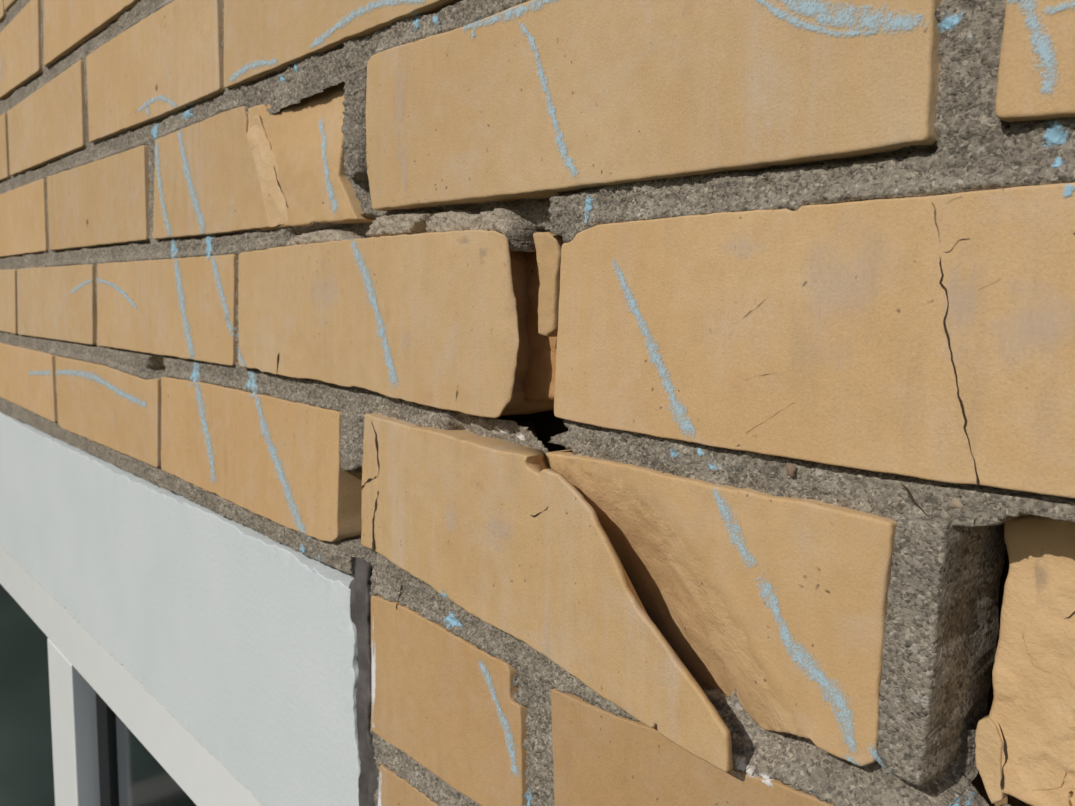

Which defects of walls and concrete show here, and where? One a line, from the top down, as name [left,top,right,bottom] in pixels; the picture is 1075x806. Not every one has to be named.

spalling [247,82,375,231]
crack [934,211,980,484]
crack [361,421,379,551]
spalling [975,515,1075,806]